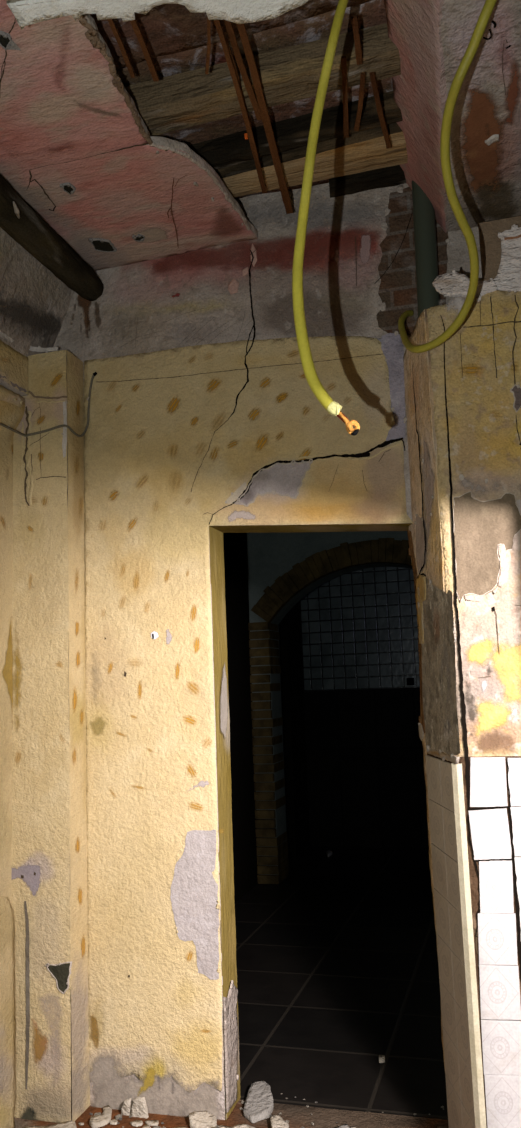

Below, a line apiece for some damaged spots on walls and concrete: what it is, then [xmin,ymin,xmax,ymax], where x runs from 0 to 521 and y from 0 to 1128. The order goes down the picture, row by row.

crack [0,18,16,88]
spalling [78,14,257,294]
water stain [0,301,60,333]
crack [106,246,521,974]
peeling [407,440,521,764]
water stain [89,1016,220,1118]
peeling [170,829,245,1113]